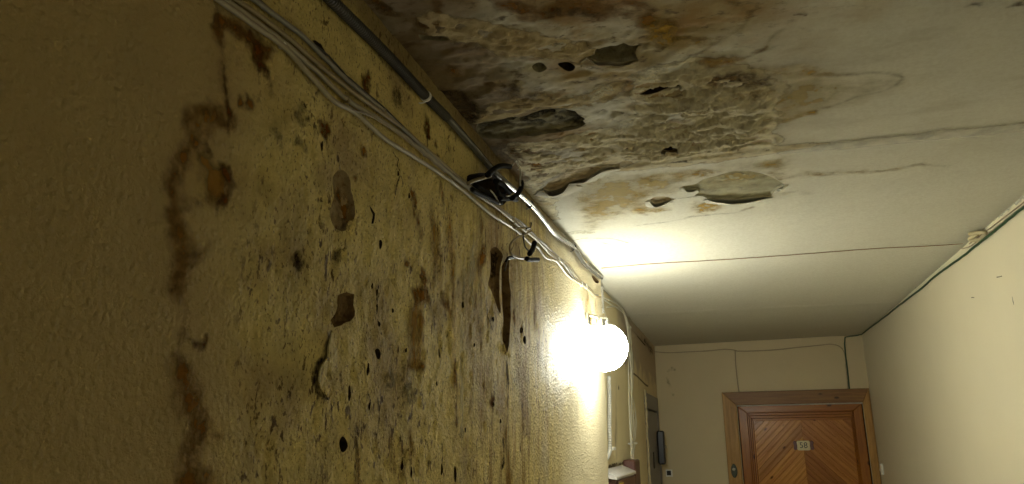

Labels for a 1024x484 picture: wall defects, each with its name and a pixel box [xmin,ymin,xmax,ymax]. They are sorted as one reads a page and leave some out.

spalling [416,10,830,220]
damp [168,75,235,292]
spalling [330,170,356,232]
damp [579,176,669,215]
peeling [314,292,355,400]
spalling [488,247,526,355]
damp [175,358,211,484]